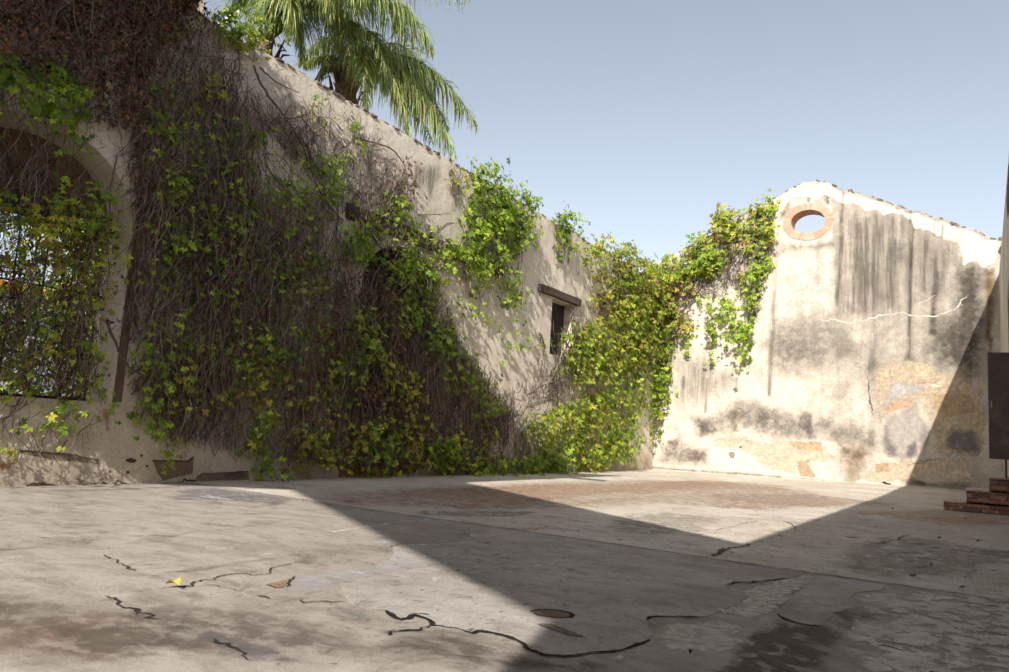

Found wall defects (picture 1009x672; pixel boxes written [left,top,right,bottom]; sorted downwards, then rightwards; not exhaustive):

leakage [853,227,912,304]
crack [819,295,967,324]
leakage [930,254,982,370]
flaking render [716,436,835,477]
leakage [700,406,866,474]
flaking render [865,361,987,487]
crack [105,595,161,619]
crack [161,561,345,603]
crack [374,609,697,657]
spalling [531,610,585,637]
peeling [655,565,816,658]
peeling [839,529,1009,672]